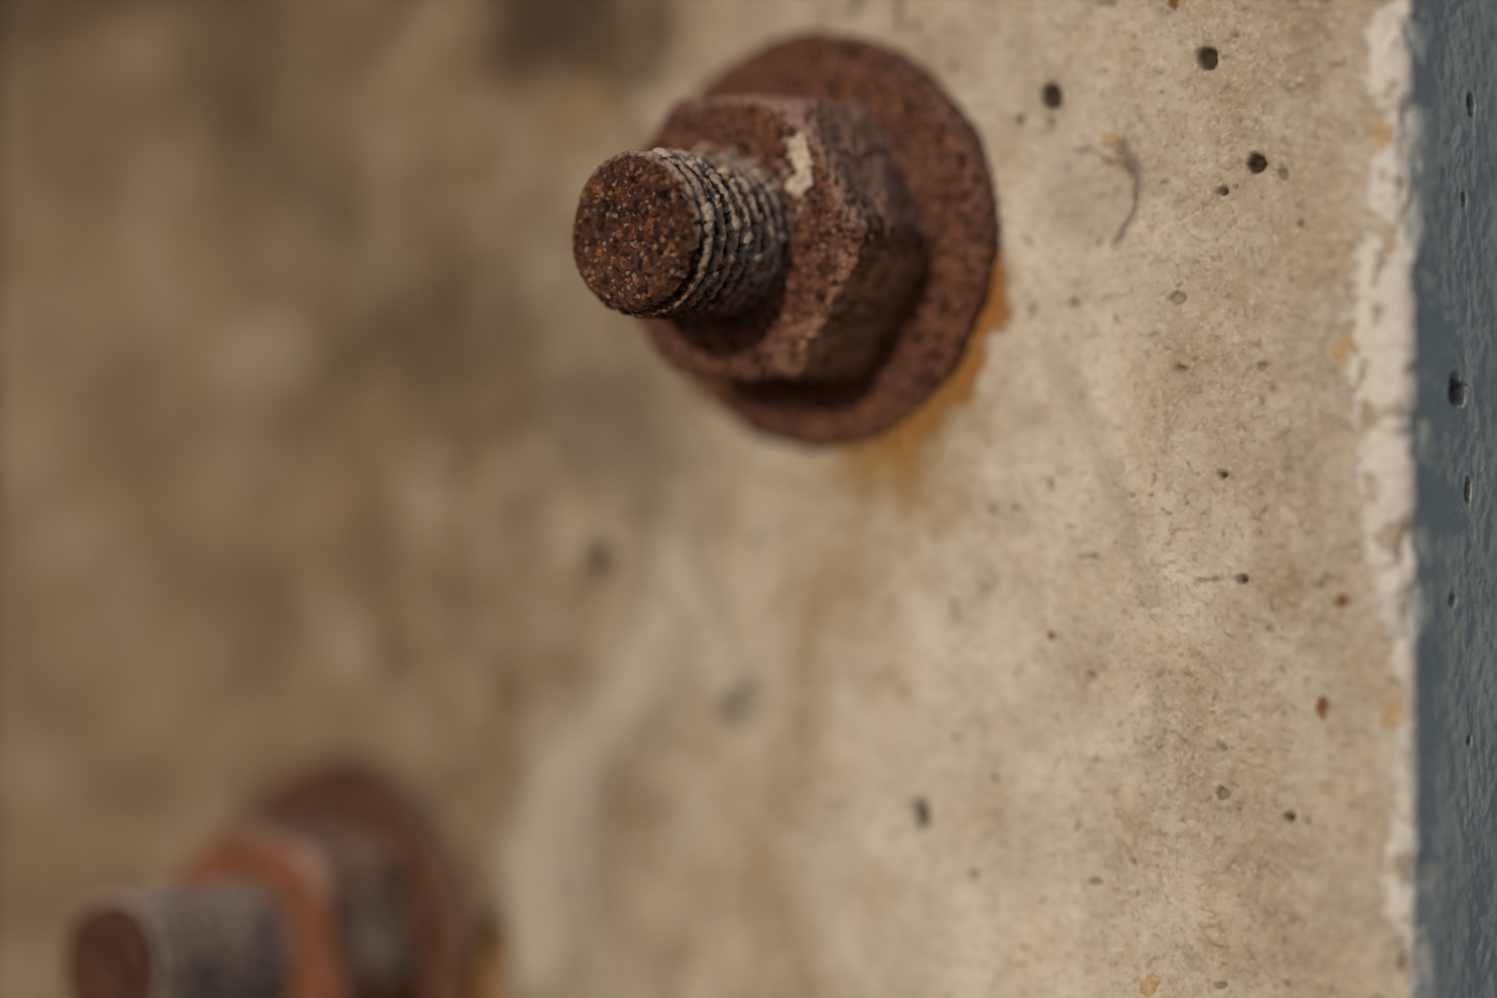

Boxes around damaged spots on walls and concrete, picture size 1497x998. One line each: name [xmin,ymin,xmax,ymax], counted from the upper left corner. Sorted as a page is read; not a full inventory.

corrosion [850,251,1011,509]